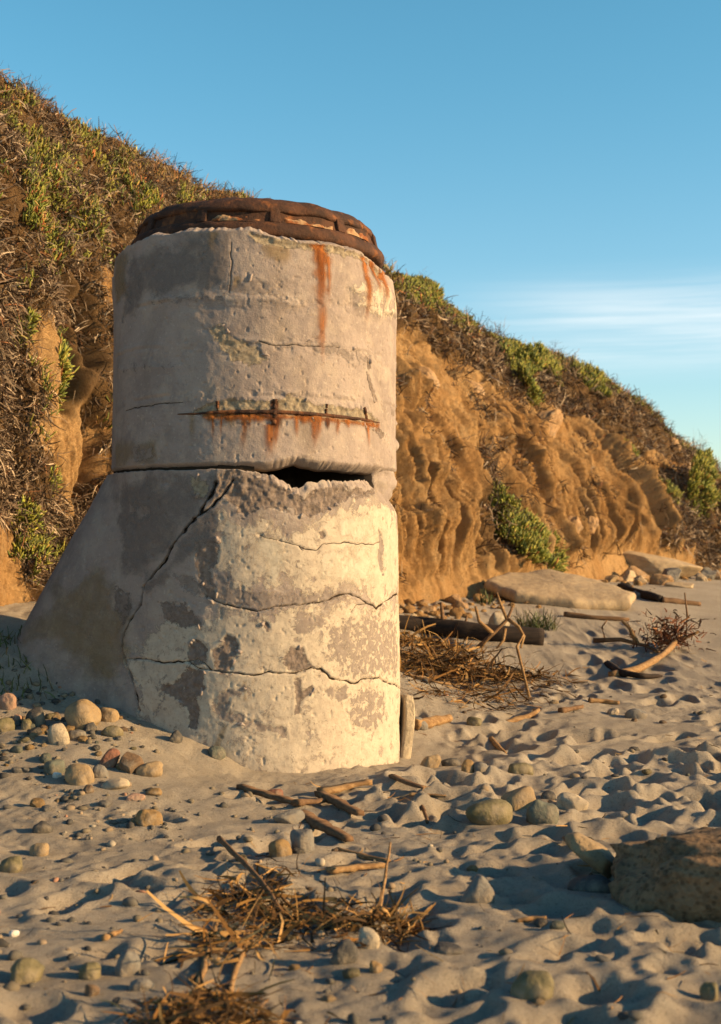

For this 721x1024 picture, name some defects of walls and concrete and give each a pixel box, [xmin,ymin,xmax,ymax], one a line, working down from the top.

rust [311,244,331,297]
rust [360,257,389,302]
rust [178,399,380,446]
crack [114,465,399,711]
peeling [123,470,400,774]